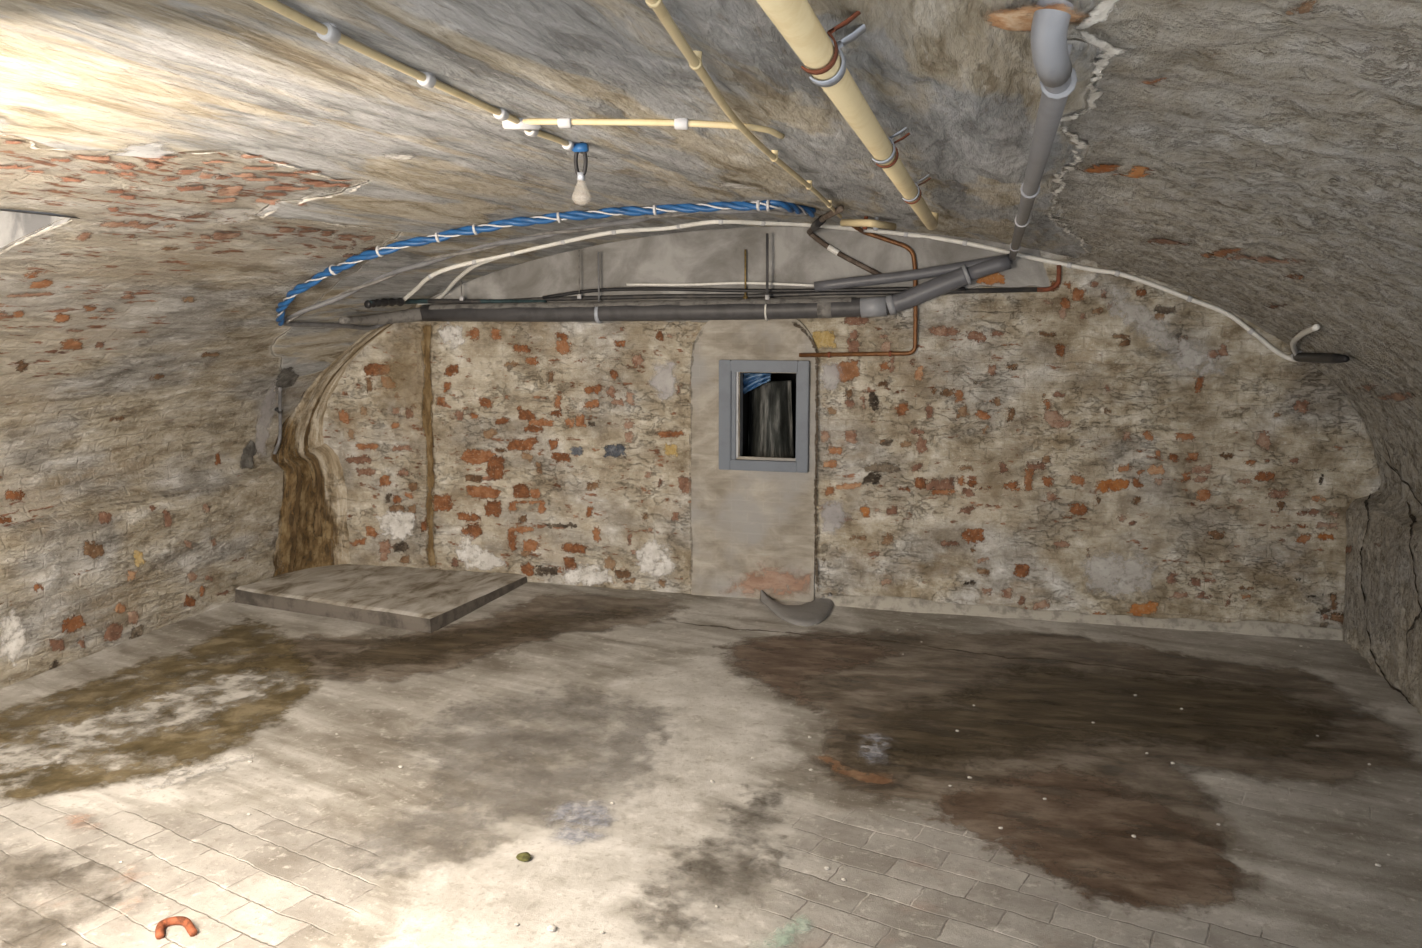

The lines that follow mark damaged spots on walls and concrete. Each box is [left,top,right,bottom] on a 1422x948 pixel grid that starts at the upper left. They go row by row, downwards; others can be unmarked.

flaking render [1047,0,1154,253]
water stain [0,565,685,800]
water stain [720,629,1414,910]
crack [1360,446,1422,706]